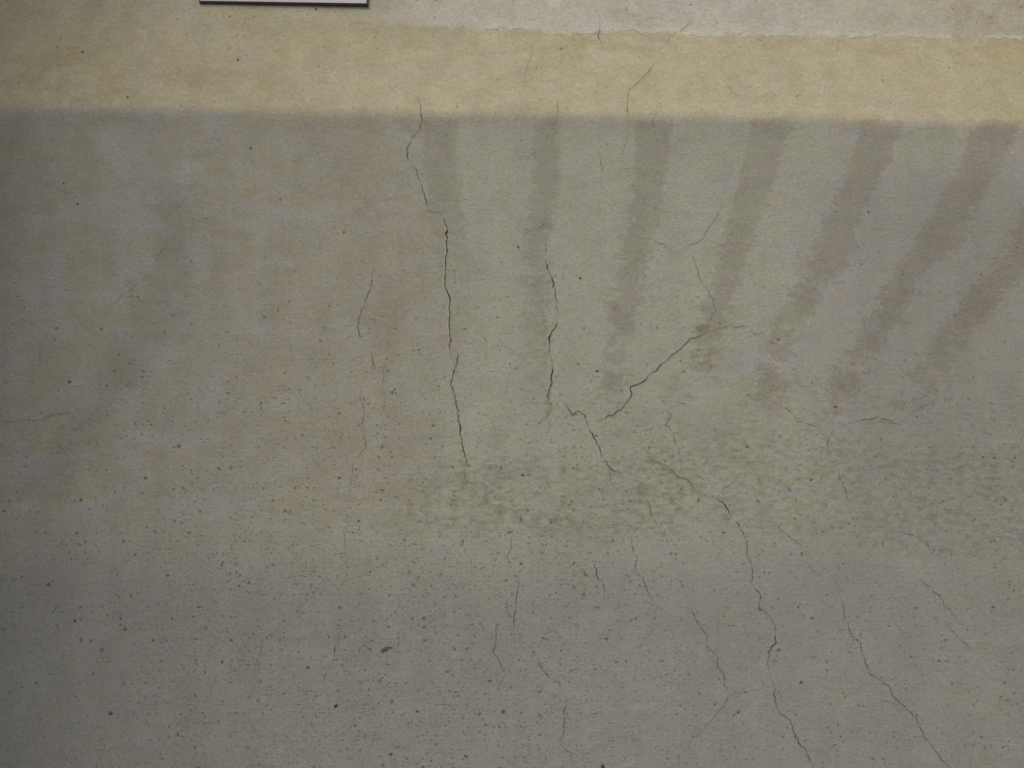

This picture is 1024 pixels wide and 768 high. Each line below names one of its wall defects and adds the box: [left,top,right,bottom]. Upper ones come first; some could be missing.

crack [406,101,467,494]
crack [534,201,771,481]
crack [631,410,820,763]